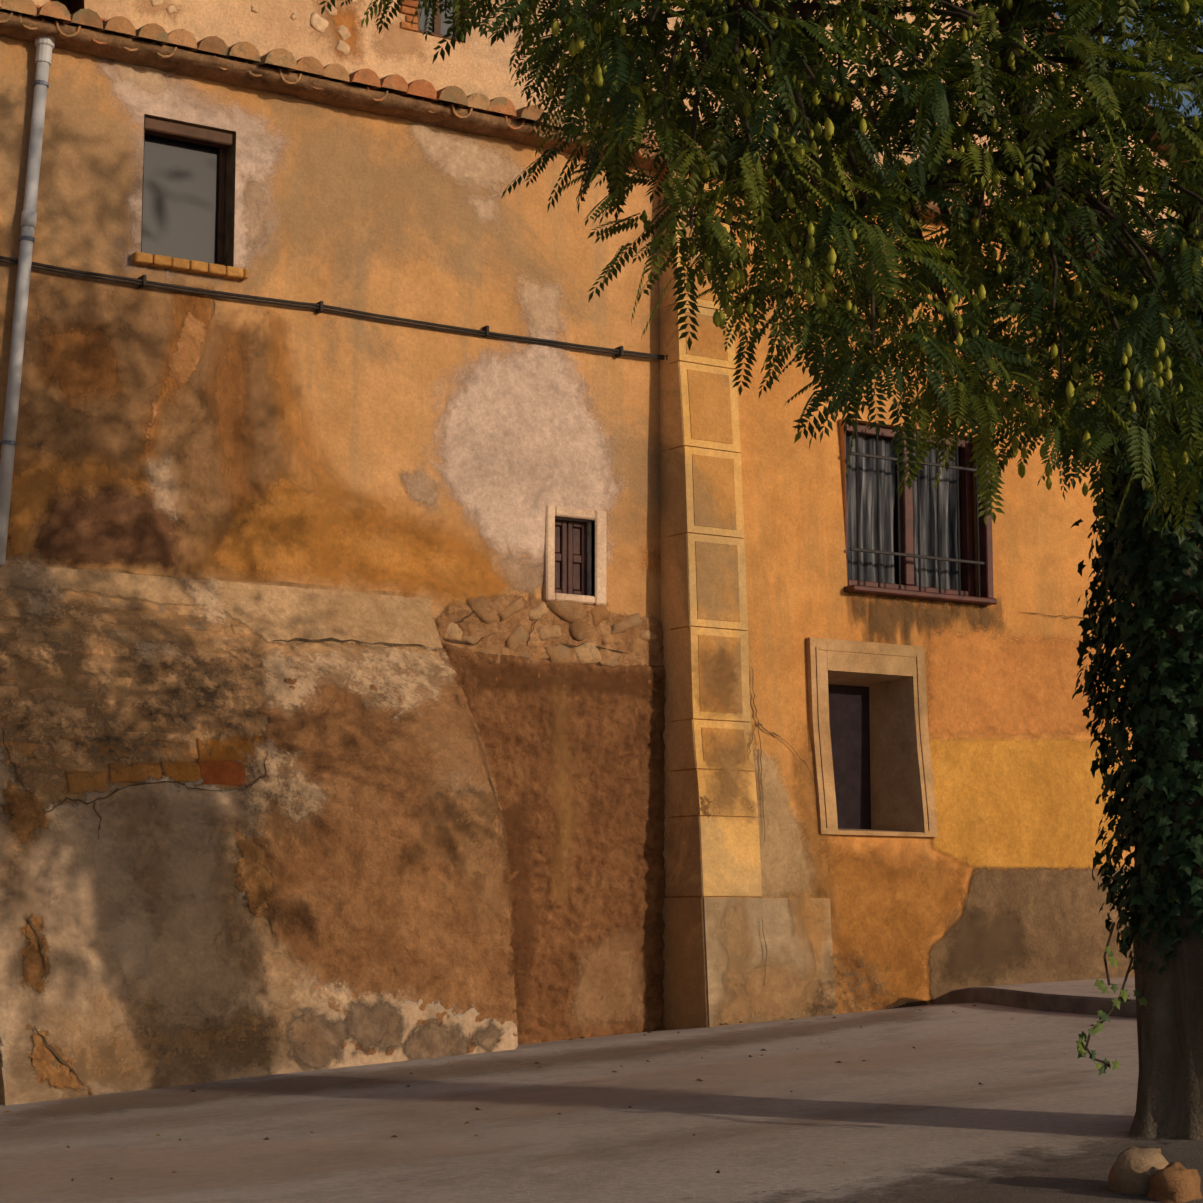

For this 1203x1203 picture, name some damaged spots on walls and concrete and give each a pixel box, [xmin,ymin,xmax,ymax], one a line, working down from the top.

peeling [521,282,562,337]
water stain [0,274,506,623]
water stain [75,641,456,759]
crack [0,726,268,839]
spalling [18,914,51,993]
spalling [26,1025,93,1094]